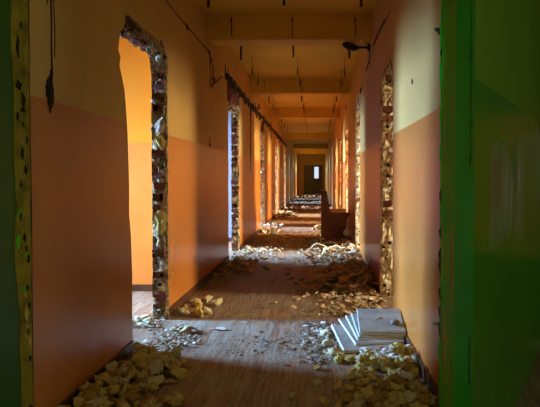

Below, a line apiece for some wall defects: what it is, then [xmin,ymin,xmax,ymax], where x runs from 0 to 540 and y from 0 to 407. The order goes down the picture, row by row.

spalling [120,12,169,319]
spalling [227,81,240,251]
spalling [380,53,393,298]